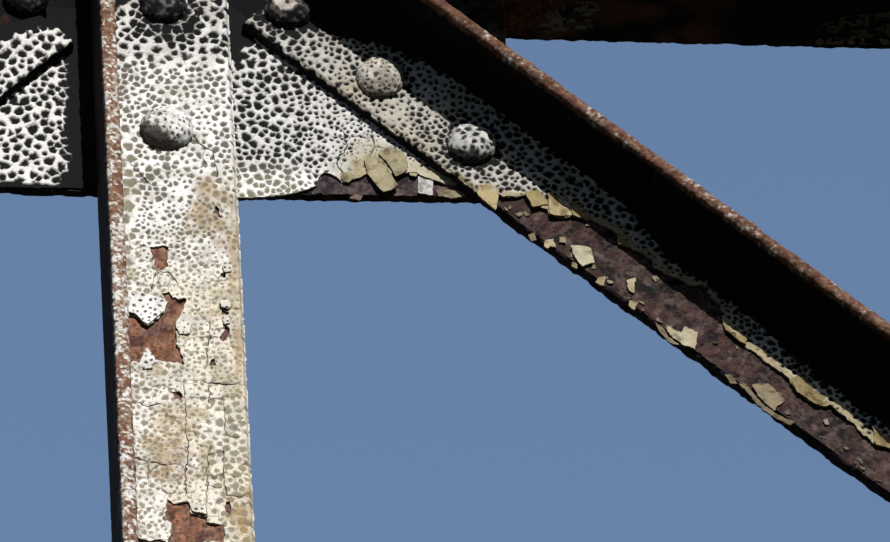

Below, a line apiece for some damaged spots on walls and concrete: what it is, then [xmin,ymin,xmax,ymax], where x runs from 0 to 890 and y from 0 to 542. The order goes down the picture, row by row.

peeling [140,246,168,271]
peeling [128,293,192,370]
peeling [312,147,890,493]
crack [135,319,246,519]
peeling [138,501,225,542]